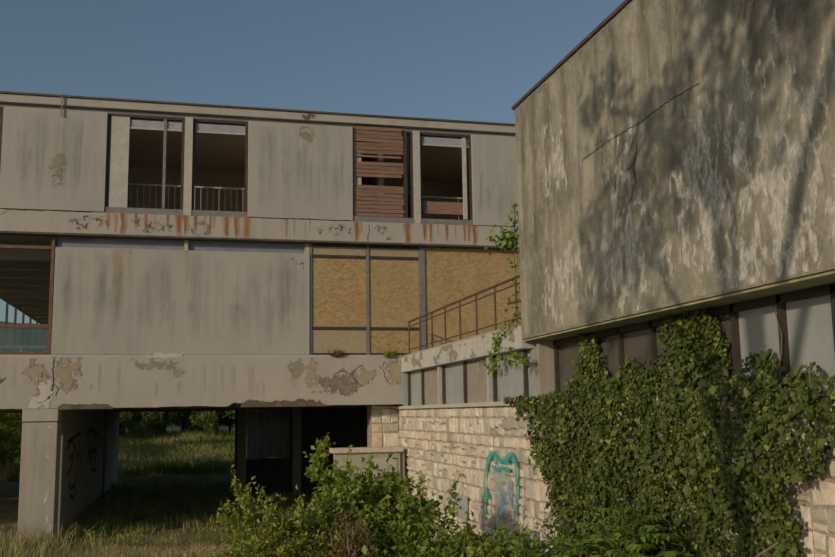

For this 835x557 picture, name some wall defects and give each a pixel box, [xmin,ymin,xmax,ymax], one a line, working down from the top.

crack [581,82,700,203]
peeling [23,356,113,410]
peeling [131,352,185,377]
peeling [240,359,377,407]